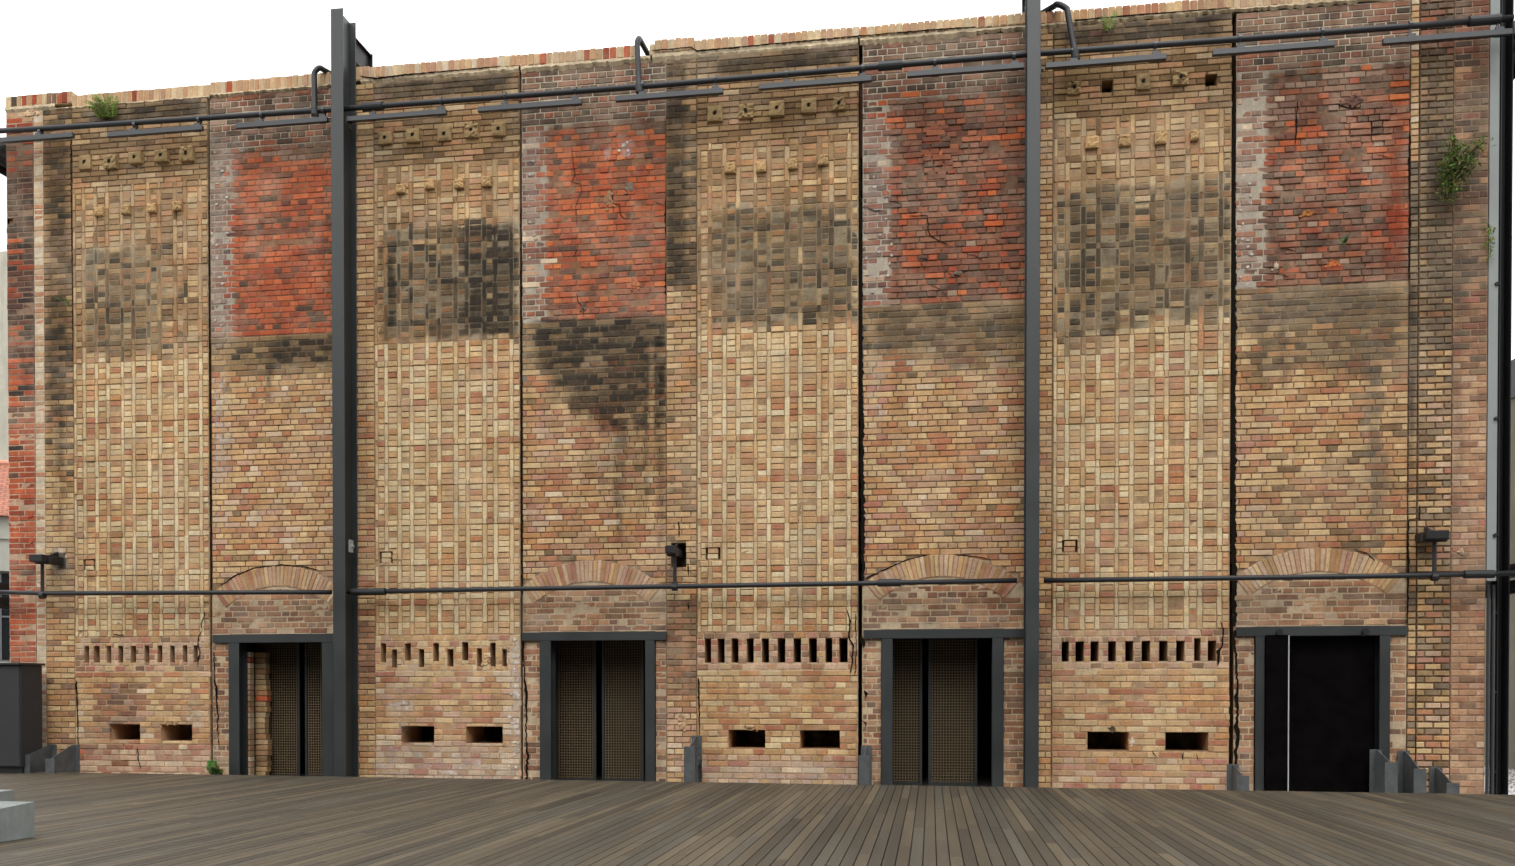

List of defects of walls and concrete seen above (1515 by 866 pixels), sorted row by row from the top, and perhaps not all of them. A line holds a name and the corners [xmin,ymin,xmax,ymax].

crack [197,203,317,744]
crack [520,154,666,595]
crack [847,157,991,727]